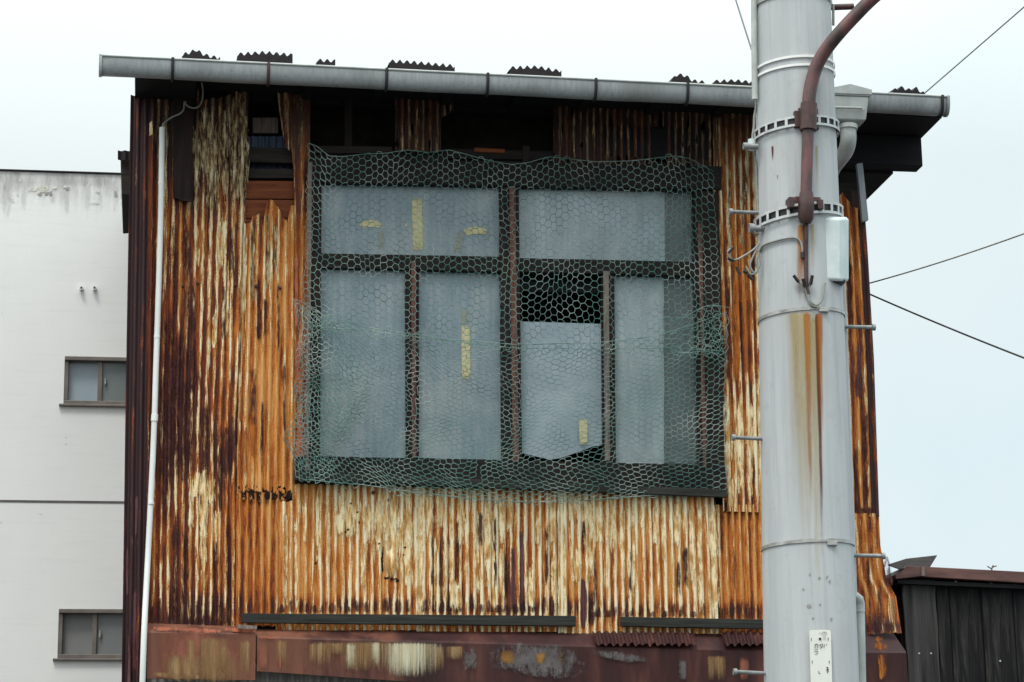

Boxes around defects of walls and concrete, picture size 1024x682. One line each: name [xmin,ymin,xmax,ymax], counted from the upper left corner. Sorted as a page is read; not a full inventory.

peeling [188,93,250,215]
corrosion [256,275,280,349]
corrosion [722,207,755,380]
corrosion [147,225,237,626]
corrosion [250,371,264,460]
corrosion [792,313,822,494]
corrosion [848,263,875,513]
corrosion [278,513,555,613]
corrosion [580,521,705,628]
corrosion [720,500,759,619]
corrosion [865,557,897,679]